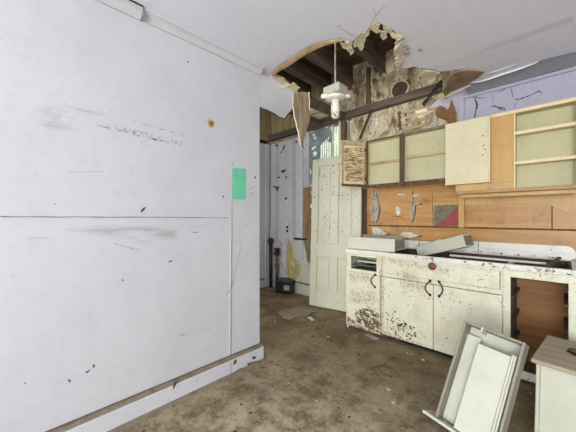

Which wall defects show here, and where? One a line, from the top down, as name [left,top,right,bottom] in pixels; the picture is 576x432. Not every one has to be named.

flaking render [272,77,300,93]
flaking render [340,22,457,142]
crack [474,89,543,118]
peeling [371,190,390,235]
peeling [397,190,423,222]